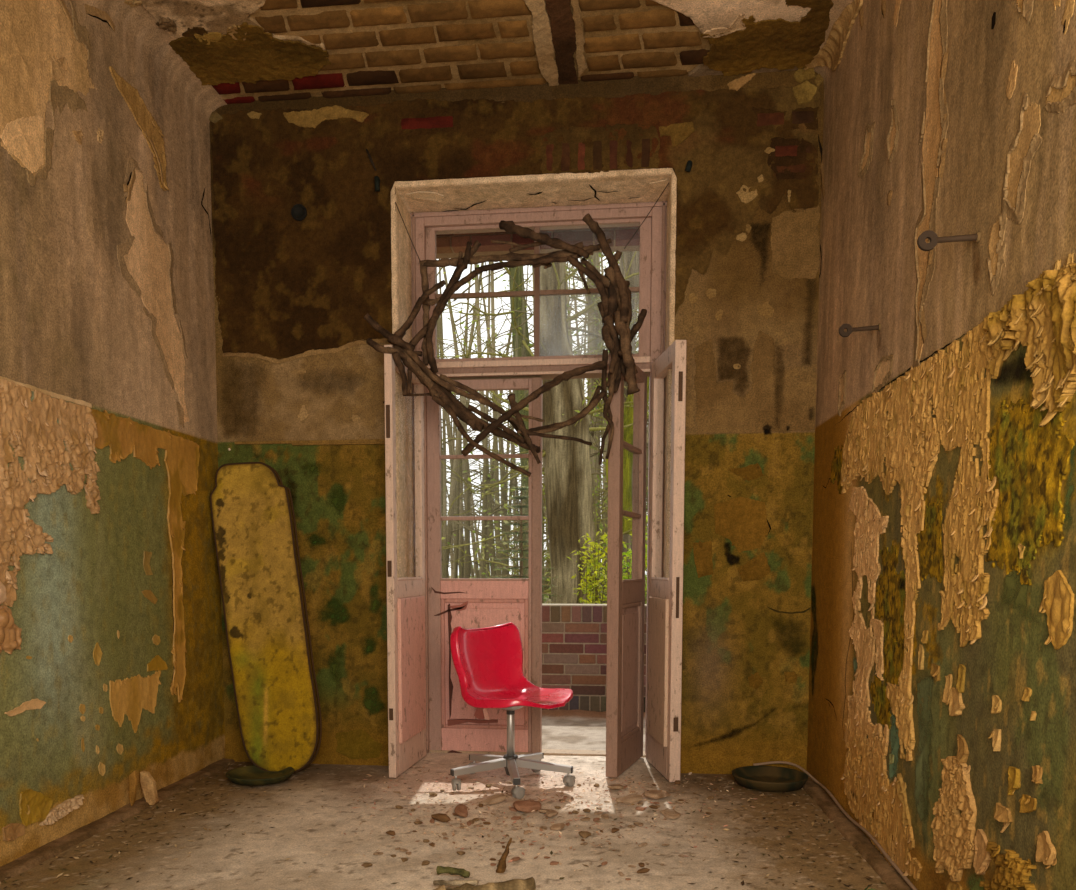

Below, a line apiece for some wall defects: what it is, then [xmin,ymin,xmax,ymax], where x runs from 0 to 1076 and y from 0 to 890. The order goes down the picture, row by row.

peeling [0,0,95,187]
flaking render [156,0,834,374]
peeling [0,66,200,733]
peeling [830,0,1076,890]
leakage [724,542,740,565]
peeling [19,789,84,827]
peeling [81,738,106,776]